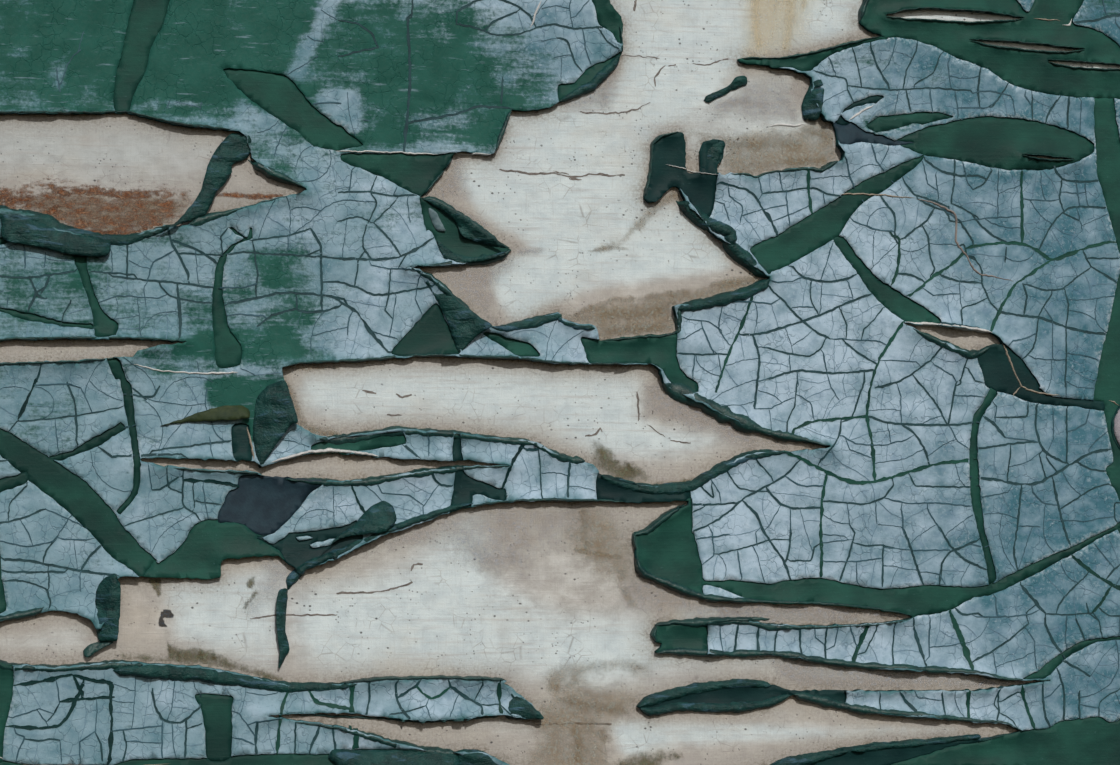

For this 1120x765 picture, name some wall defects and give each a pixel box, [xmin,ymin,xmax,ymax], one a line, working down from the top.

crack [113,0,170,114]
crack [403,0,513,152]
rust [0,184,185,235]
peeling [0,110,306,257]
peeling [340,0,1120,352]
crack [0,68,439,619]
crack [456,0,1120,730]
crack [351,390,571,514]
peeling [0,303,1120,765]
crack [0,662,612,765]